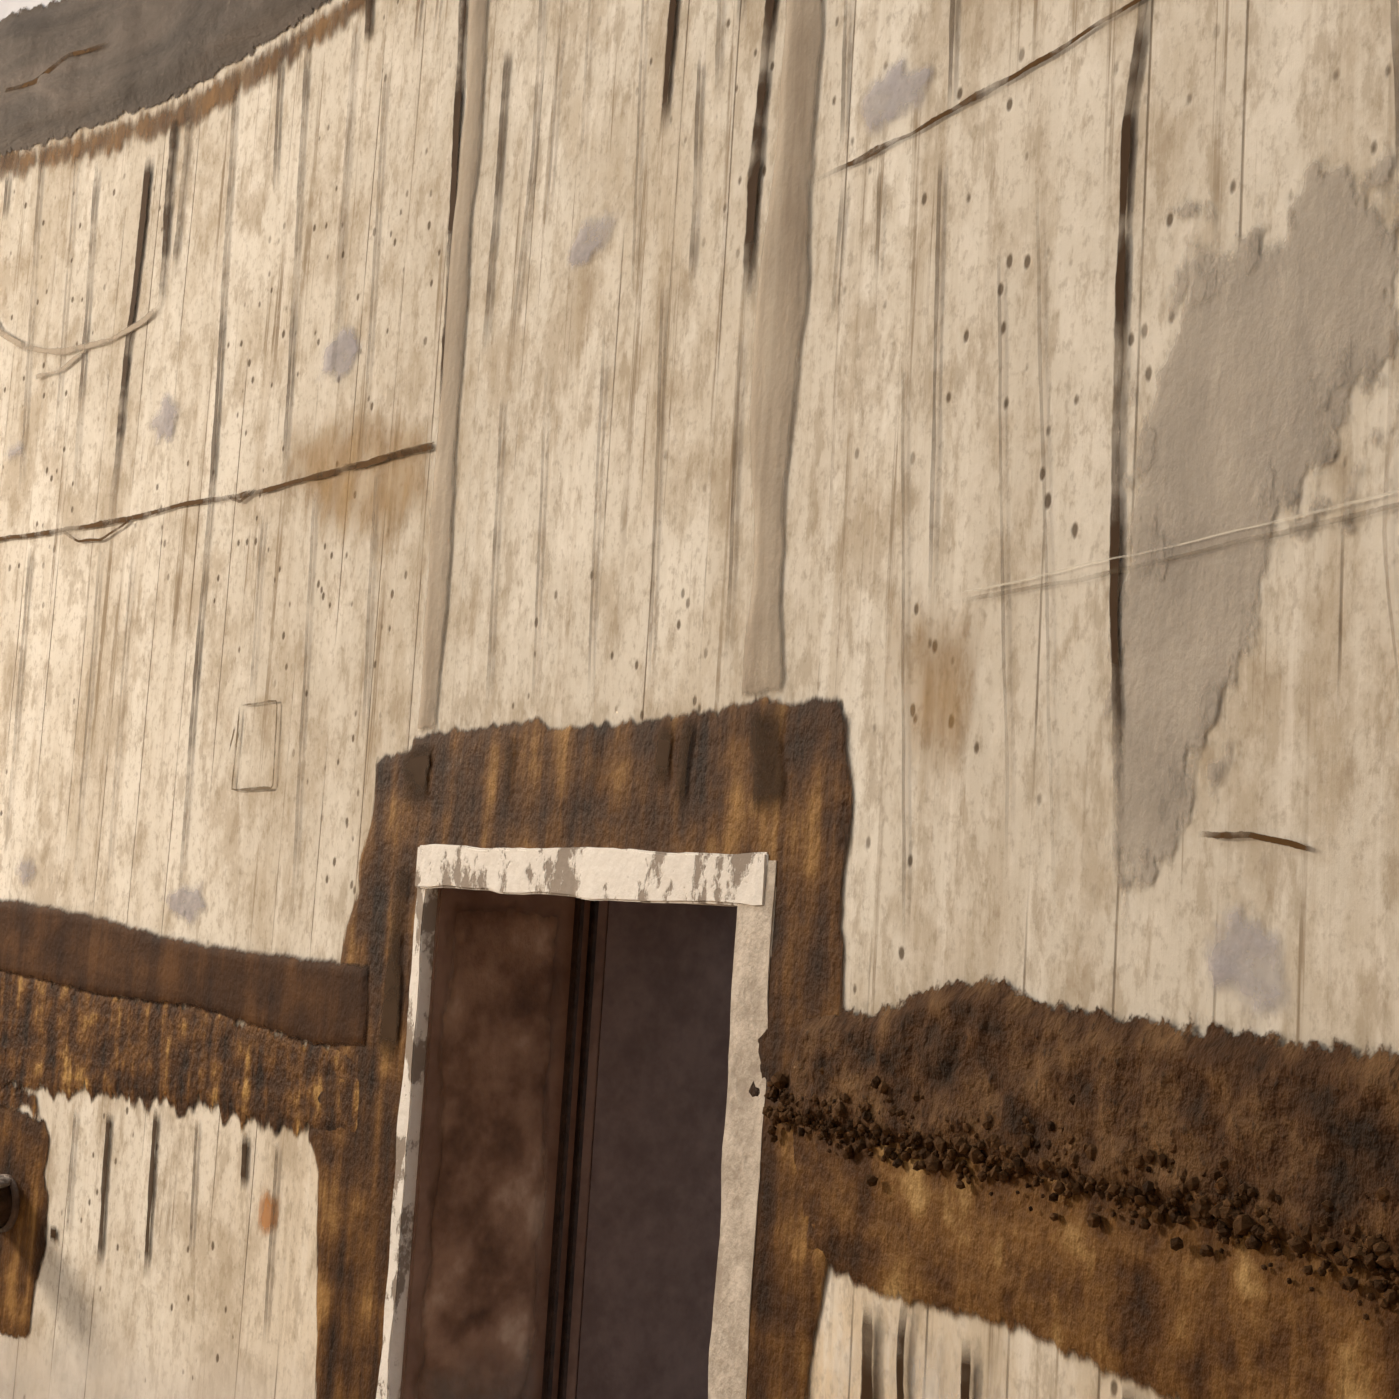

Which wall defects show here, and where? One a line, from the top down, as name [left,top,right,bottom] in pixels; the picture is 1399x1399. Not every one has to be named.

crack [843,0,1141,169]
crack [0,442,433,542]
peeling [1105,156,1399,890]
corrosion [0,696,1399,1399]
water stain [860,1313,873,1399]
water stain [896,1315,906,1399]
water stain [961,1352,971,1399]